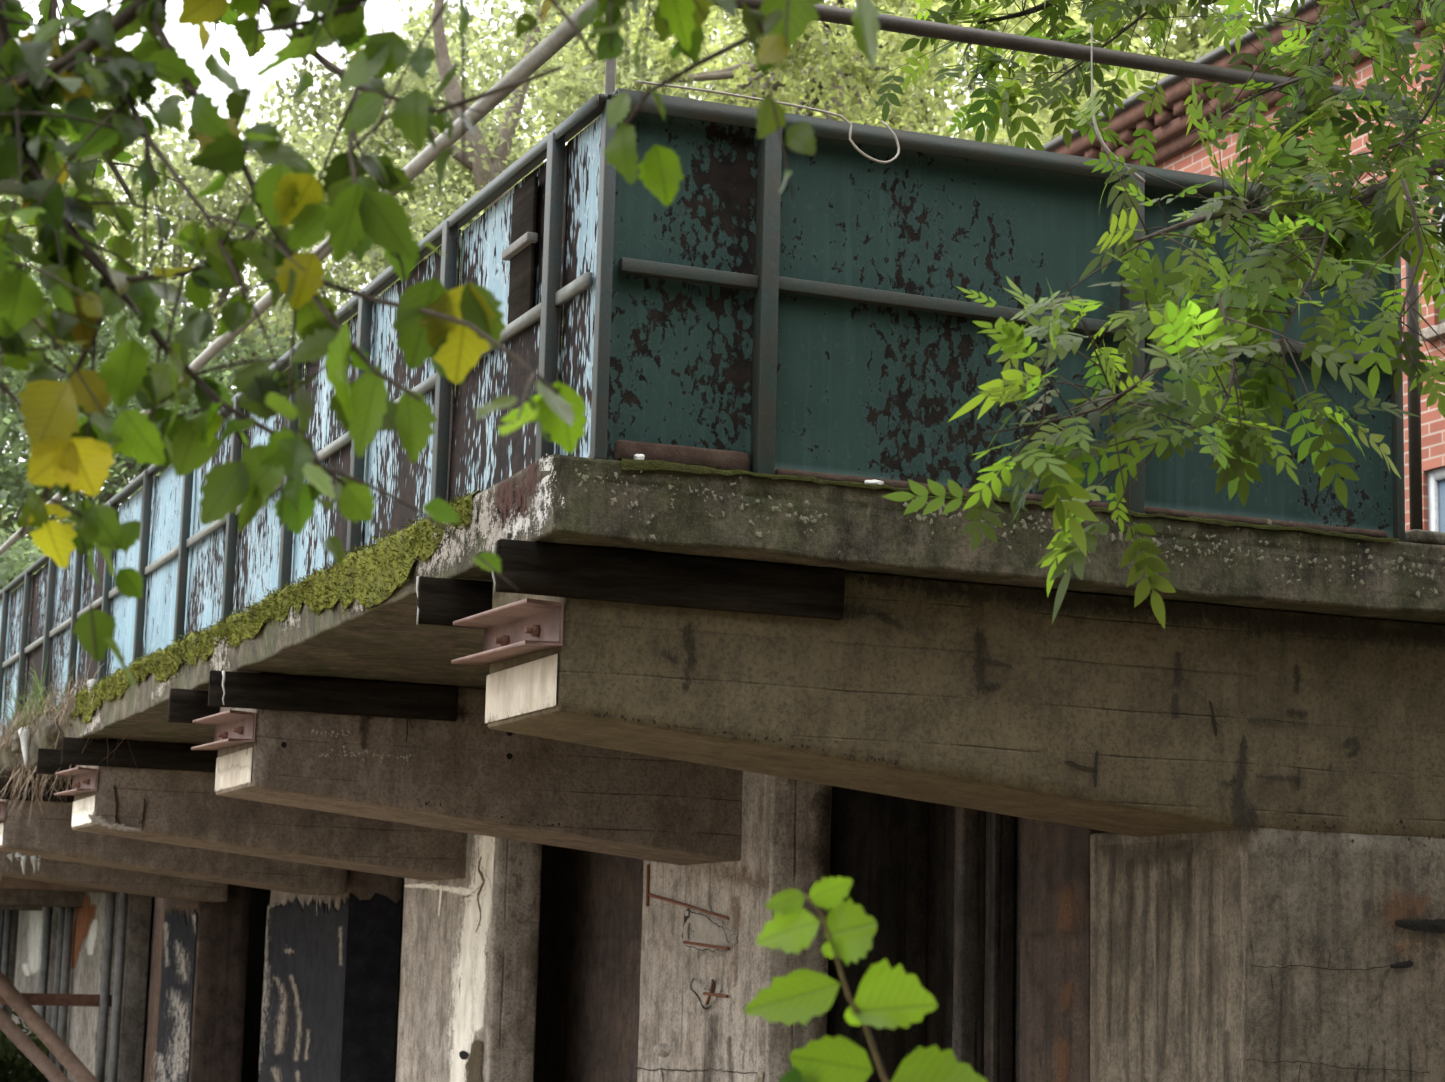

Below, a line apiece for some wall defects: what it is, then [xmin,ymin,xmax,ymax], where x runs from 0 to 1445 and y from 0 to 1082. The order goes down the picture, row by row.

damp [145,664,183,702]
damp [202,636,231,671]
damp [277,605,301,633]
rust [71,894,97,969]
peeling [150,913,197,1082]
peeling [258,903,311,1082]